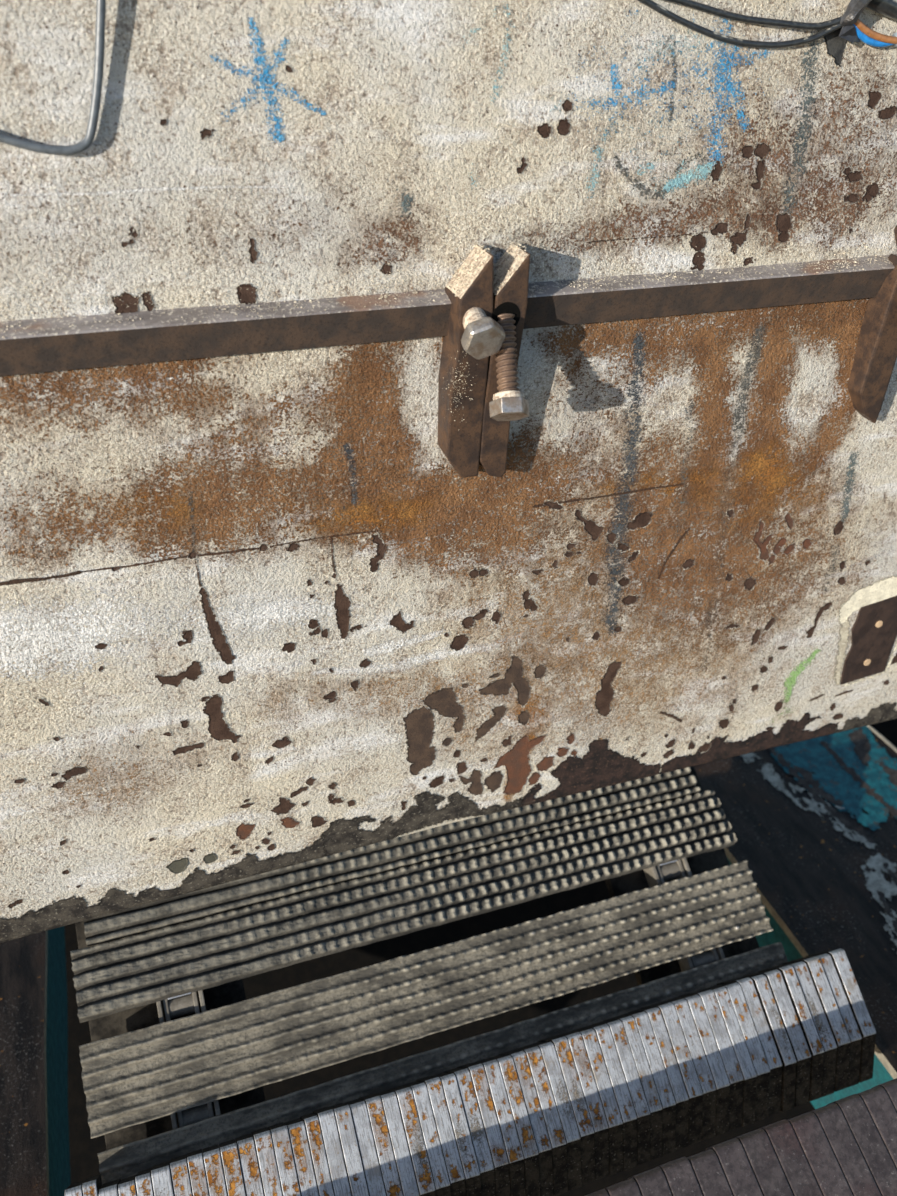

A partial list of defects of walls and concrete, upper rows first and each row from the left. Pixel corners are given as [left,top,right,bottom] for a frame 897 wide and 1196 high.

peeling [709,161,723,183]
peeling [742,143,771,190]
crack [587,231,708,243]
peeling [689,213,756,271]
peeling [110,291,156,314]
peeling [236,284,257,305]
crack [533,483,683,508]
corrosion [0,298,897,824]
peeling [806,601,834,638]
peeling [163,587,241,767]
peeling [751,646,788,692]
peeling [0,656,897,953]